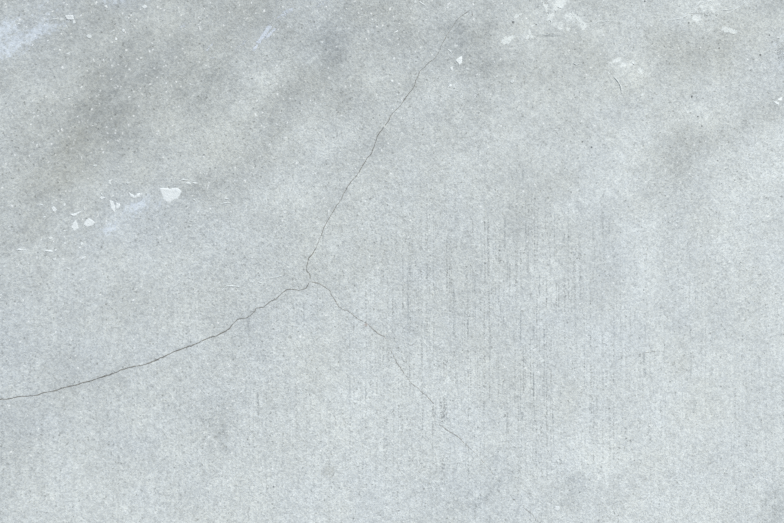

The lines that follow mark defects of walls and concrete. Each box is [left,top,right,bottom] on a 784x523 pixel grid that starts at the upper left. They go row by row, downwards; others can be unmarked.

crack [0,12,475,453]